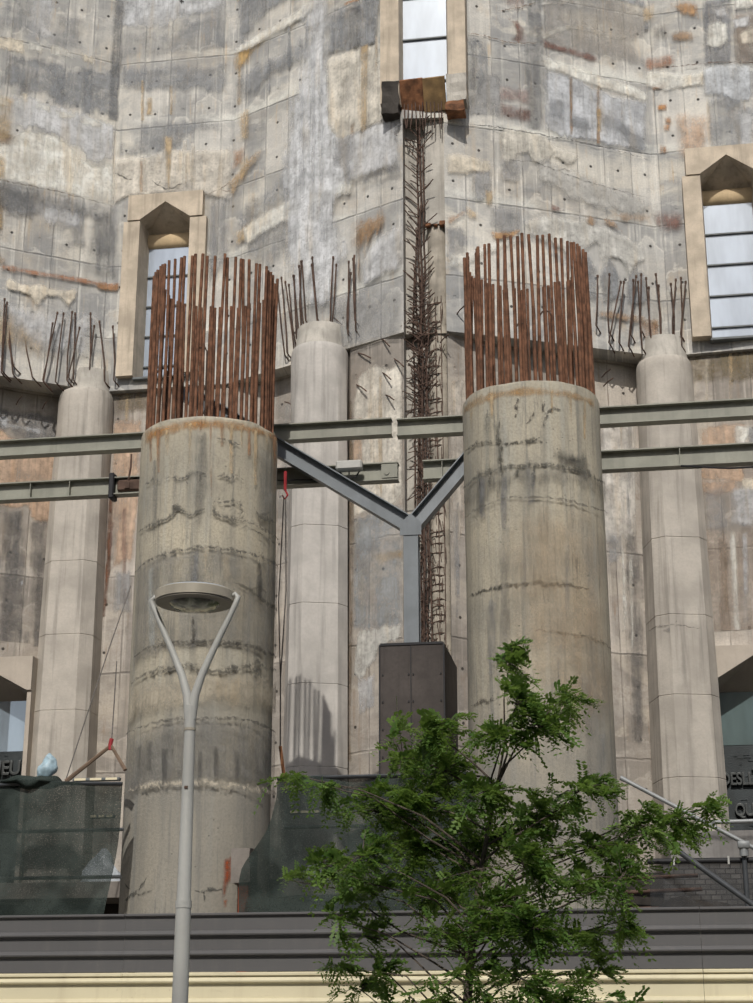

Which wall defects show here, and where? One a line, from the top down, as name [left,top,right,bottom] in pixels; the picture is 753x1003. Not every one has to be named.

rust [544,41,595,60]
rust [0,259,118,290]
rust [148,422,277,480]
crack [463,399,605,511]
crack [135,471,278,610]
crack [472,581,589,596]
leakage [709,534,752,631]
crack [131,617,276,684]